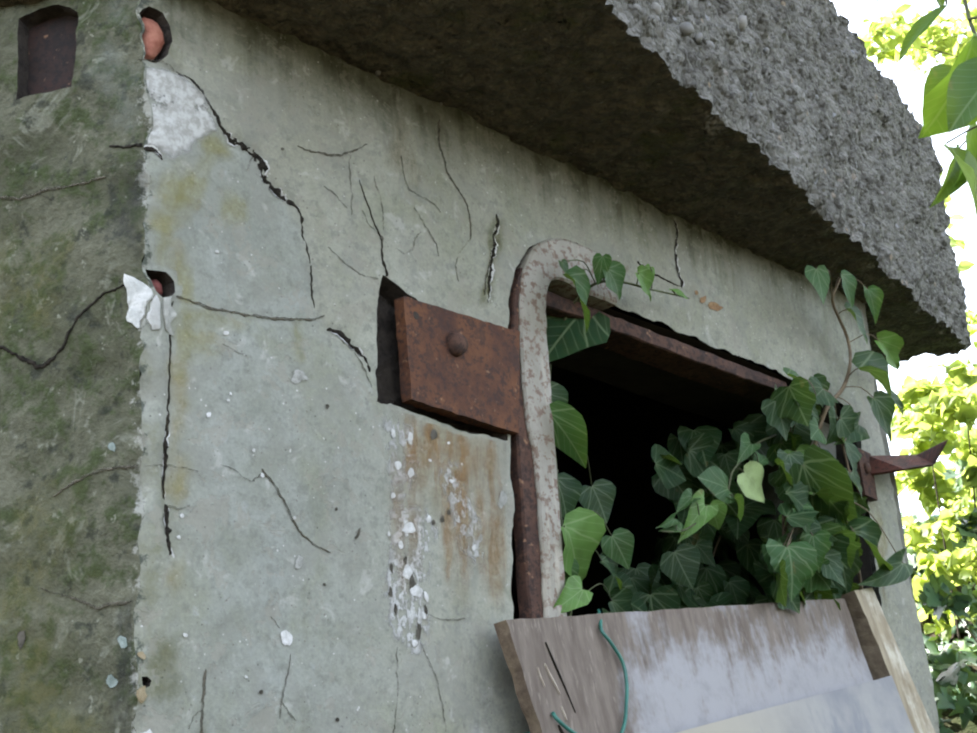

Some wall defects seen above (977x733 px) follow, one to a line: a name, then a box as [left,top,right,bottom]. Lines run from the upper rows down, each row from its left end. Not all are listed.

crack [171,72,371,372]
crack [359,180,388,276]
crack [438,119,500,303]
crack [0,284,124,369]
crack [161,335,175,558]
crack [262,469,331,553]
peeling [385,419,483,654]
spalling [375,275,508,444]